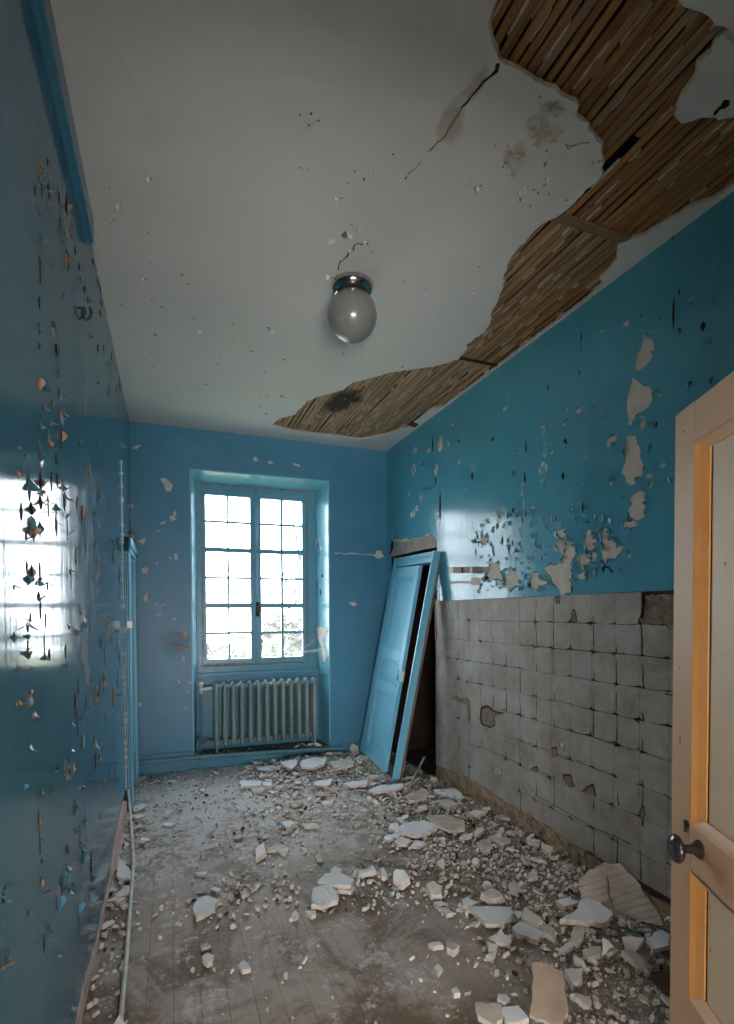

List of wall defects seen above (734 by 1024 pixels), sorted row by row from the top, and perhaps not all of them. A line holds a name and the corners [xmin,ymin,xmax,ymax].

crack [406,63,500,178]
peeling [34,157,106,317]
leakage [326,390,361,411]
peeling [408,423,461,523]
peeling [471,330,673,604]
spalling [389,533,437,557]
flaking render [14,321,176,1024]
peeling [317,625,328,663]
spalling [453,697,503,728]
spalling [641,592,674,626]